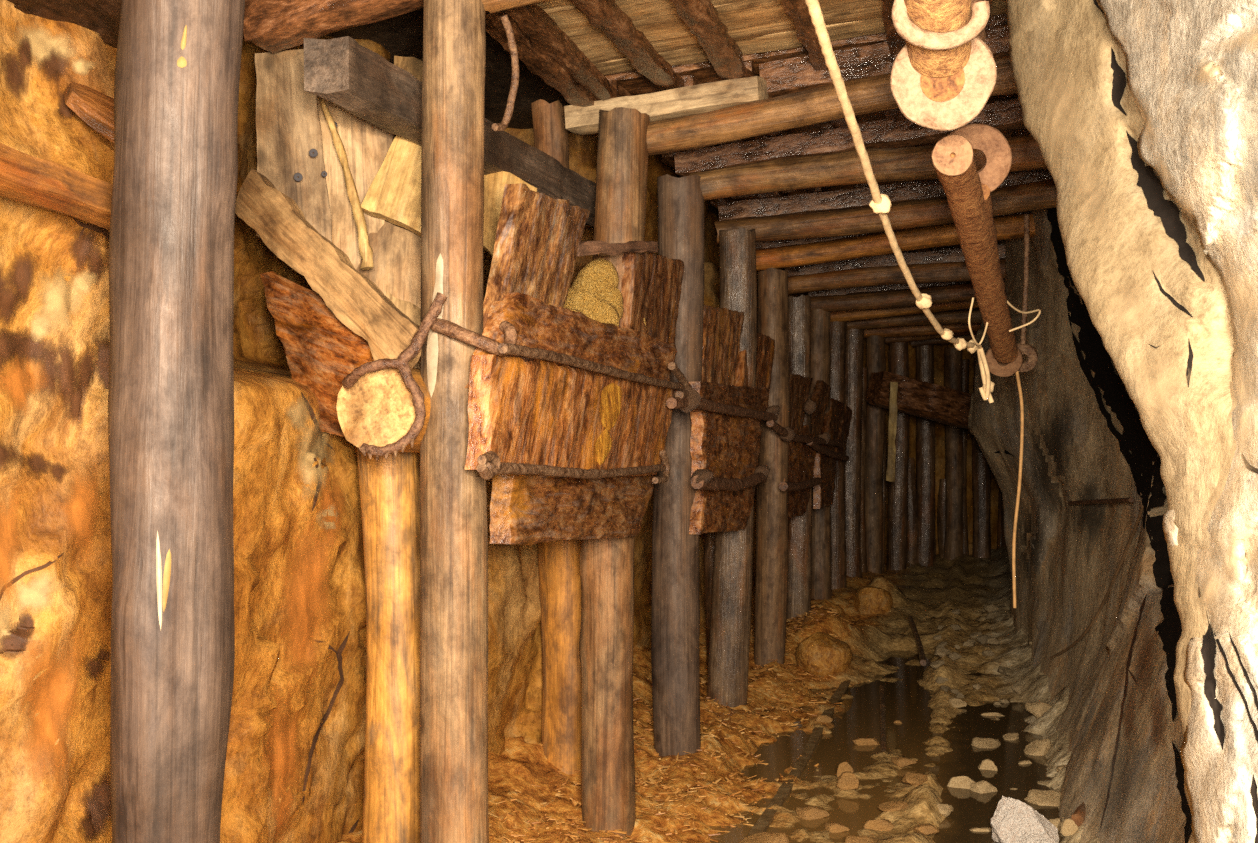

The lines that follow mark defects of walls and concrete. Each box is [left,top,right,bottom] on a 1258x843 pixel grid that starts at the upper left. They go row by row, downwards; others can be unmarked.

crack [1047,208,1258,843]